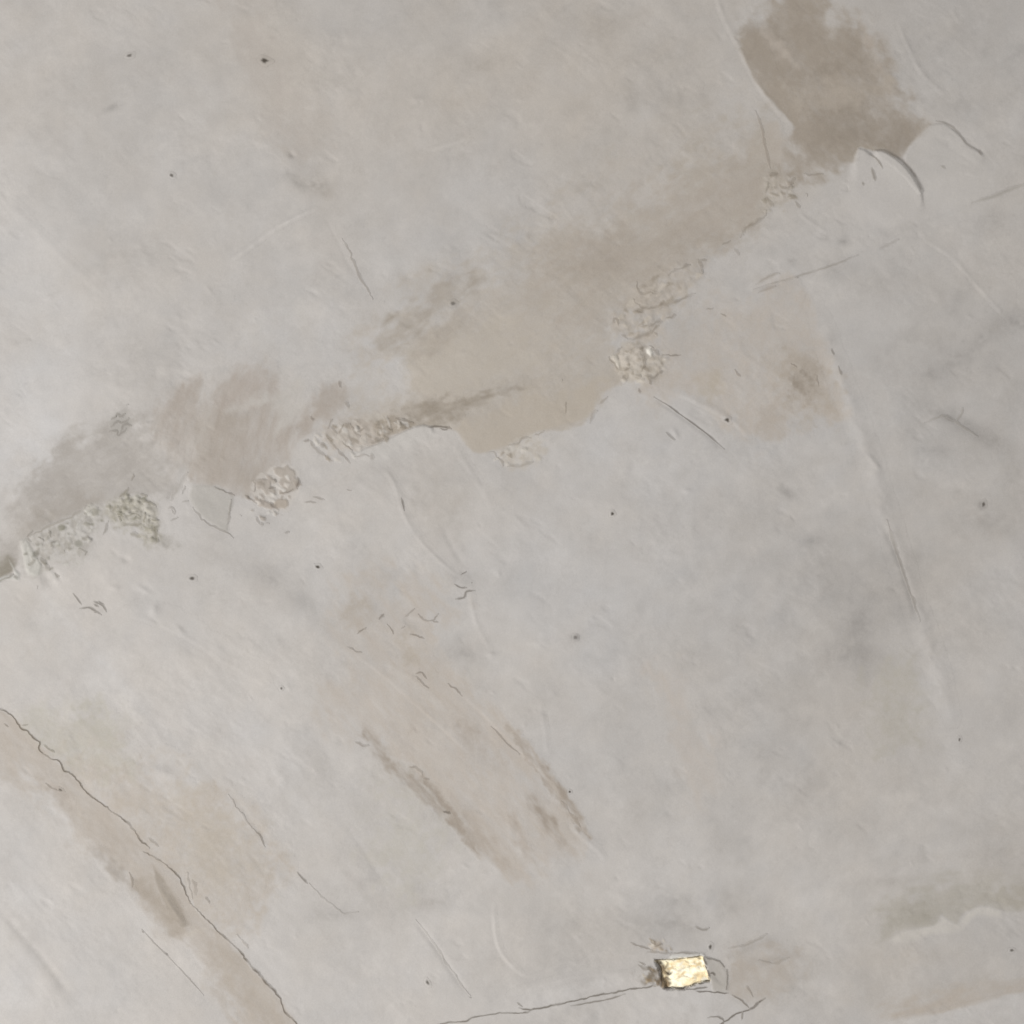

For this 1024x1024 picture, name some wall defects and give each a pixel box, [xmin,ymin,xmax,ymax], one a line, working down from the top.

water stain [0,0,935,576]
spalling [605,339,681,394]
spalling [303,402,471,467]
spalling [0,462,324,589]
water stain [297,541,595,899]
crack [0,708,298,1024]
crack [296,872,358,915]
crack [415,919,655,1024]
crack [707,985,765,1024]